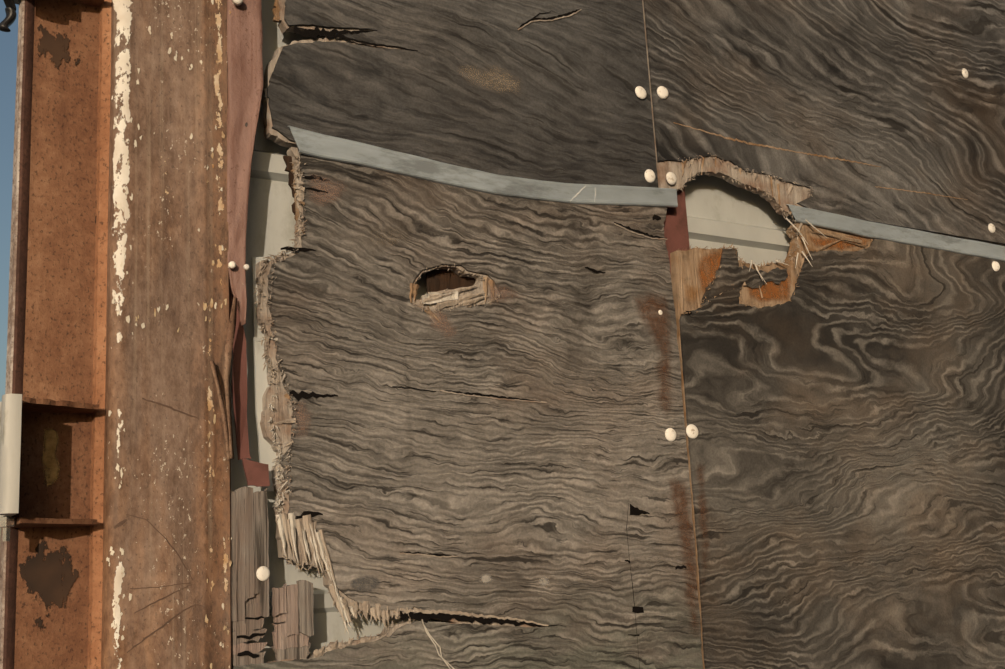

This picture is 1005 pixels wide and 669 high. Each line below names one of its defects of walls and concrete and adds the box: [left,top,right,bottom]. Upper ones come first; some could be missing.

crack [294,25,418,51]
crack [518,9,581,30]
peeling [204,0,231,214]
peeling [111,0,145,343]
peeling [203,298,227,322]
peeling [212,244,227,285]
spalling [409,263,502,323]
spalling [678,153,873,316]
peeling [207,387,216,477]
spalling [275,513,415,657]
crack [400,608,566,627]